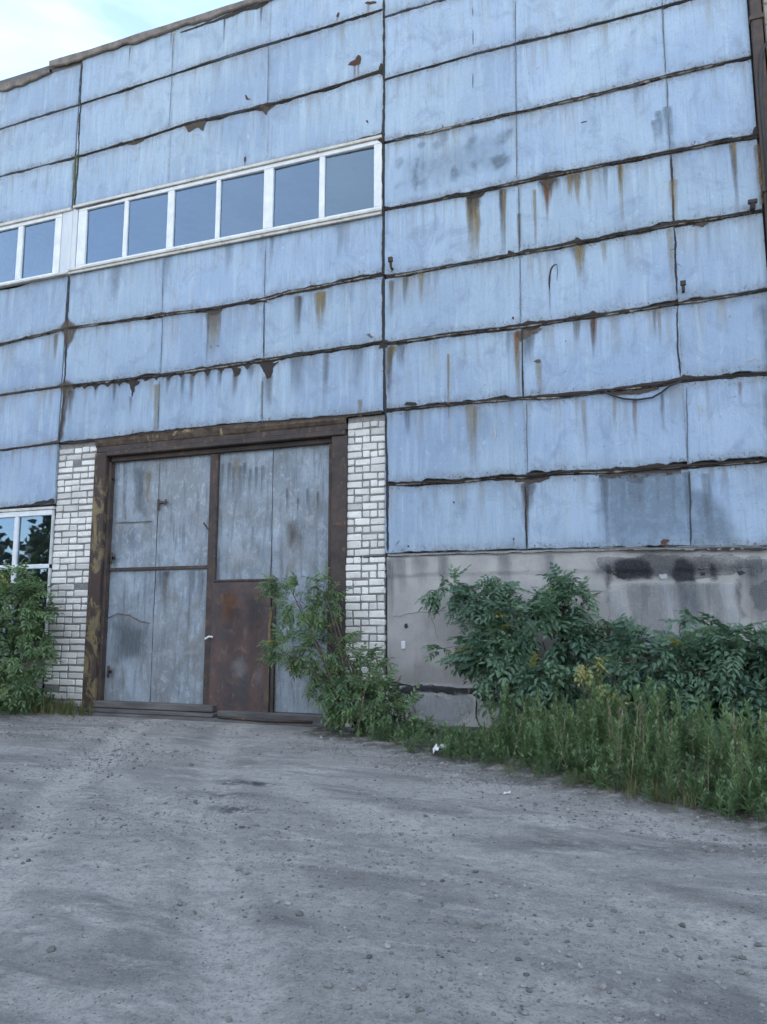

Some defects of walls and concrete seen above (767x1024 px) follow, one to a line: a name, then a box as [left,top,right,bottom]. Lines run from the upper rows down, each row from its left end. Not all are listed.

corrosion [467,198,478,228]
leakage [607,559,652,583]